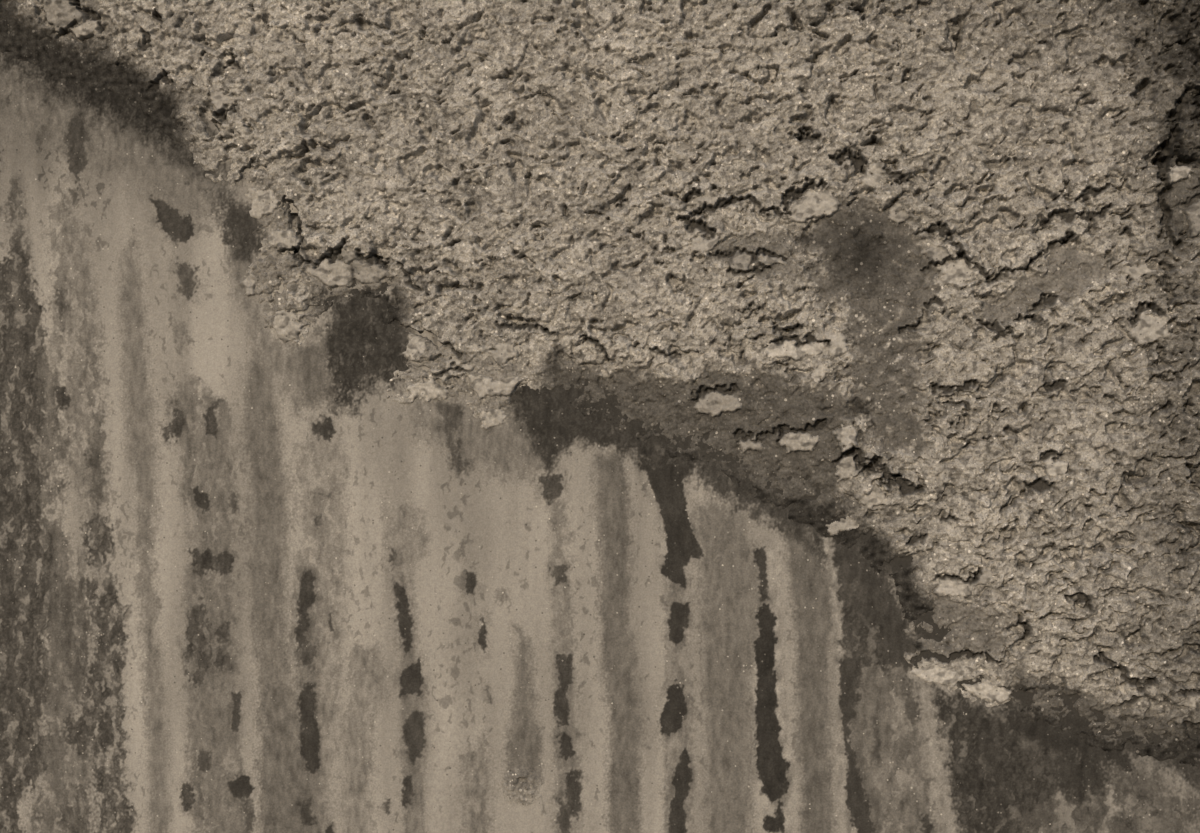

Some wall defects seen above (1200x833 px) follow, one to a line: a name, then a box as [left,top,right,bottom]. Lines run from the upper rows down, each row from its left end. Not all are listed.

damp [0,52,437,833]
damp [392,371,1200,833]